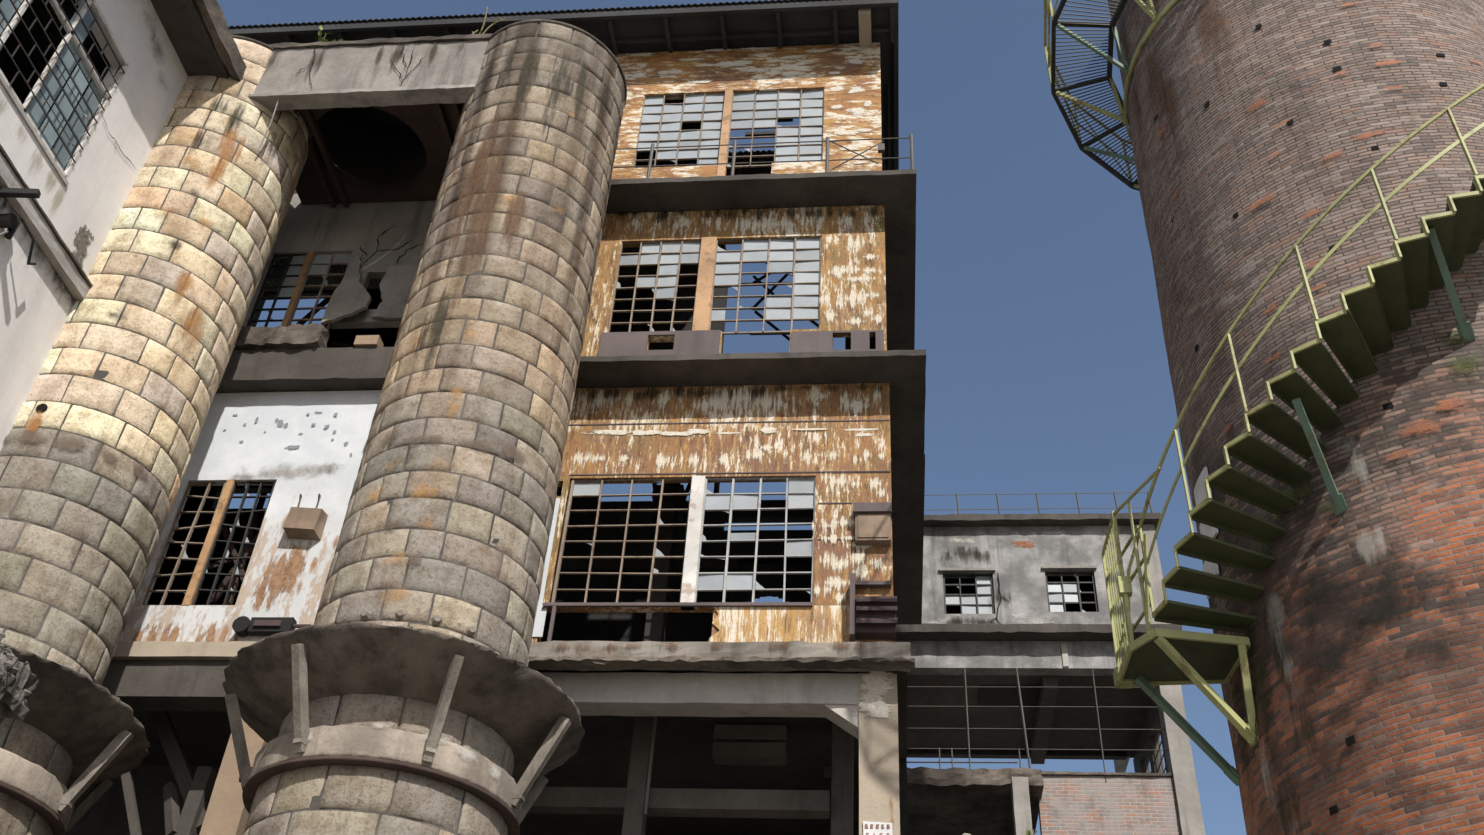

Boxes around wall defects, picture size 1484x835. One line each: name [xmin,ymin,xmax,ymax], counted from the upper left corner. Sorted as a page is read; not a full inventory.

peeling [629,47,873,164]
crack [360,226,423,264]
peeling [631,216,822,233]
peeling [819,216,882,328]
peeling [571,385,885,500]
rust [253,543,316,611]
peeling [812,516,883,605]
rust [132,622,180,641]
rust [196,624,239,642]